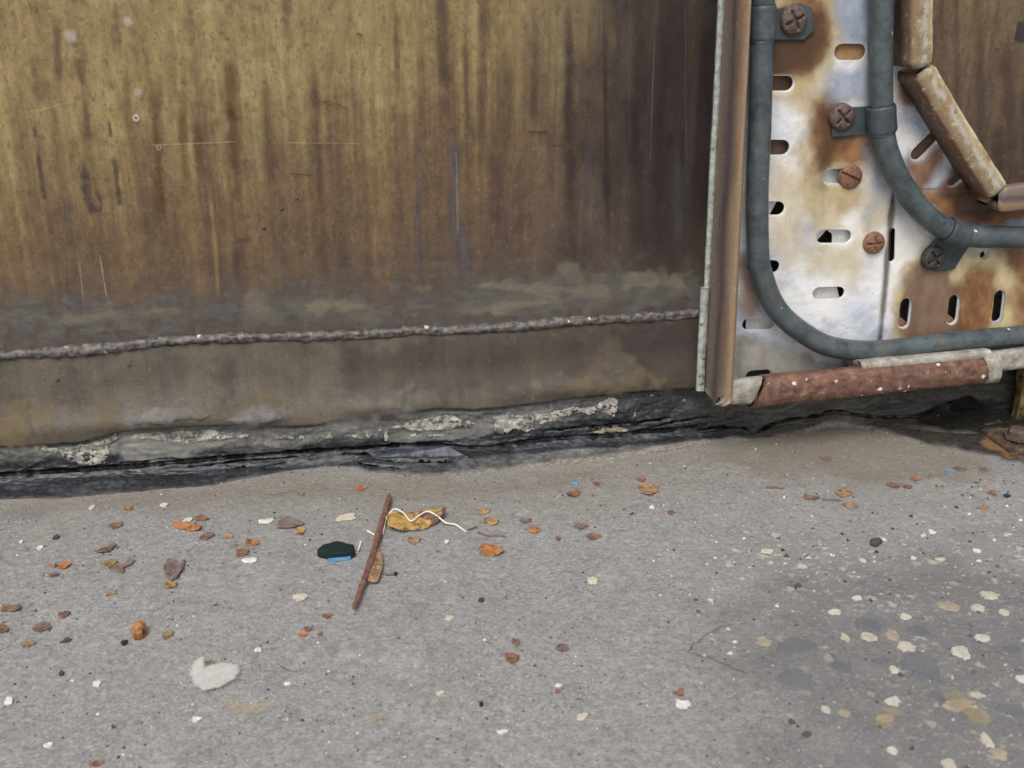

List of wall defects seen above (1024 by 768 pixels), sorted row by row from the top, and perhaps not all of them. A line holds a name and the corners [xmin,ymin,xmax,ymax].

corrosion [772,0,874,230]
corrosion [901,86,914,106]
corrosion [908,146,1024,226]
damp [0,269,700,350]
corrosion [893,248,1024,339]
peeling [30,429,248,465]
peeling [350,415,474,441]
peeling [492,397,637,434]